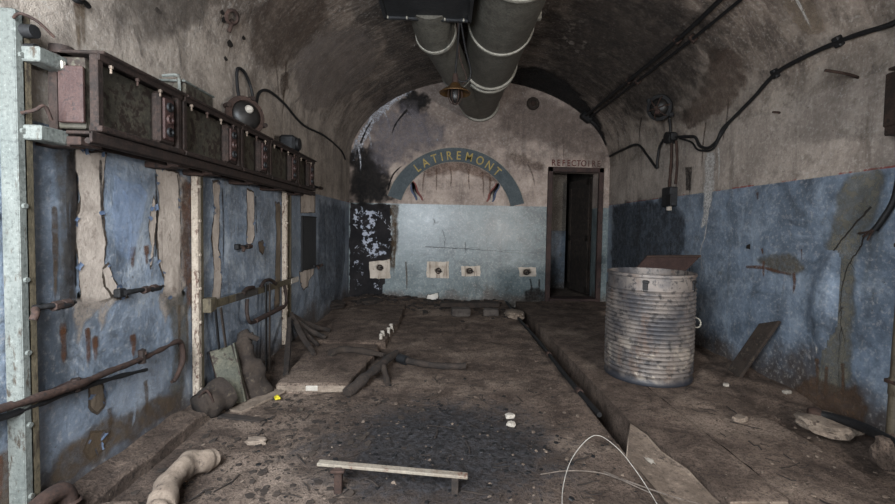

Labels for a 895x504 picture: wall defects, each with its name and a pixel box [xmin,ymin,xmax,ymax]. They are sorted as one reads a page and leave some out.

peeling [64,148,129,339]
peeling [148,169,188,321]
peeling [211,180,224,299]